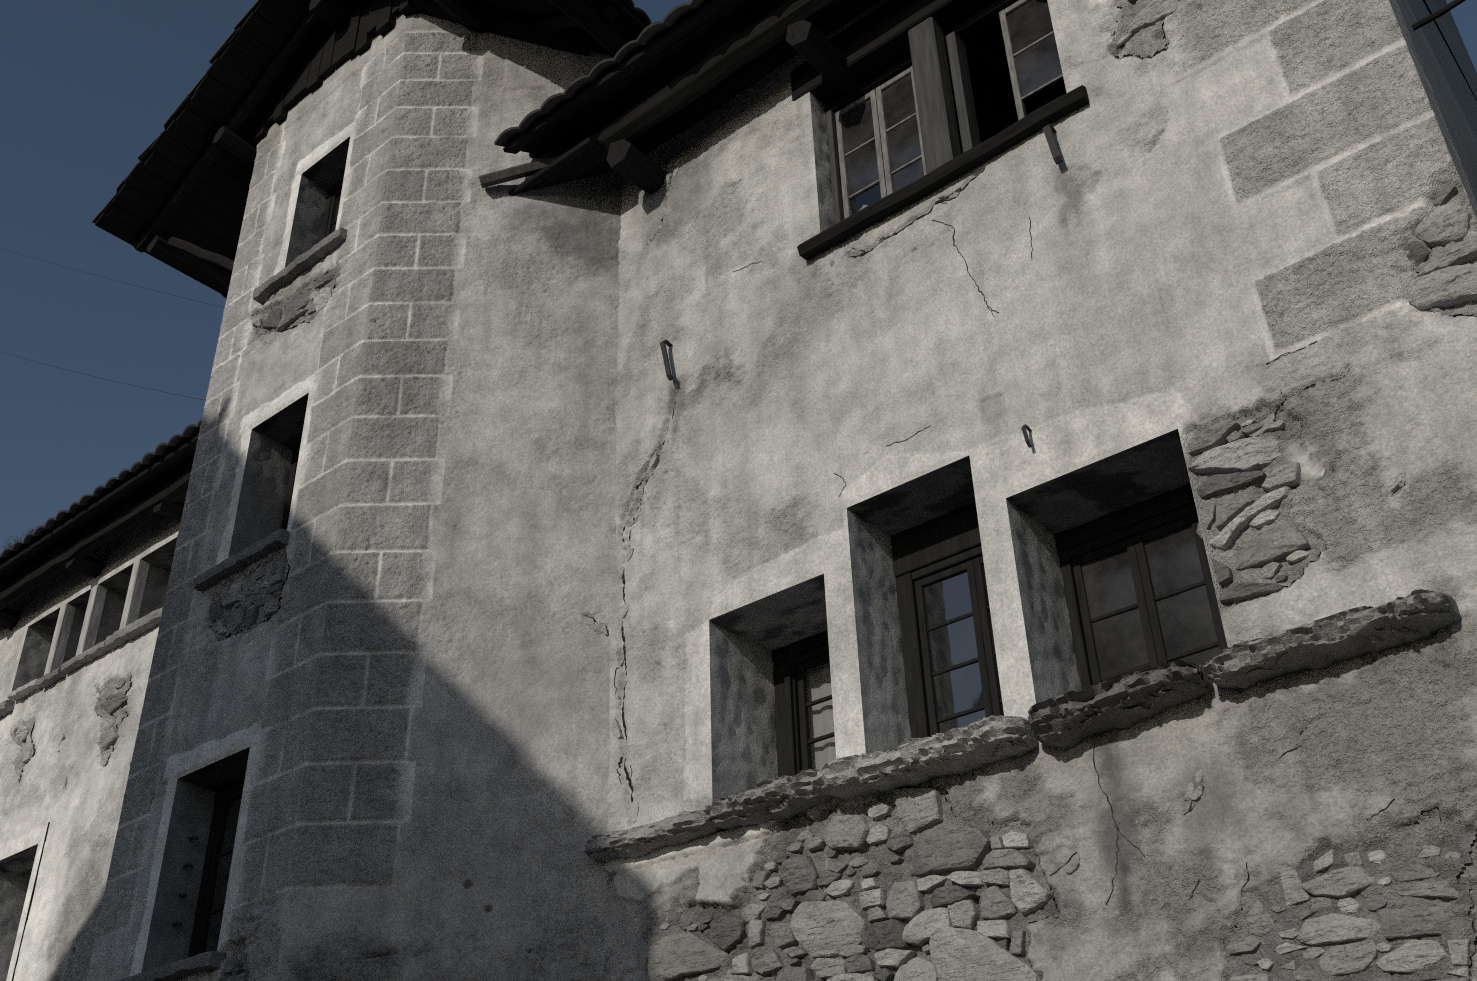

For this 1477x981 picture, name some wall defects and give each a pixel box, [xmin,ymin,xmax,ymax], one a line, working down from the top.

spalling [1109,0,1181,59]
spalling [251,266,340,337]
crack [849,171,999,316]
spalling [1188,406,1326,607]
spalling [207,553,289,641]
crack [585,388,680,823]